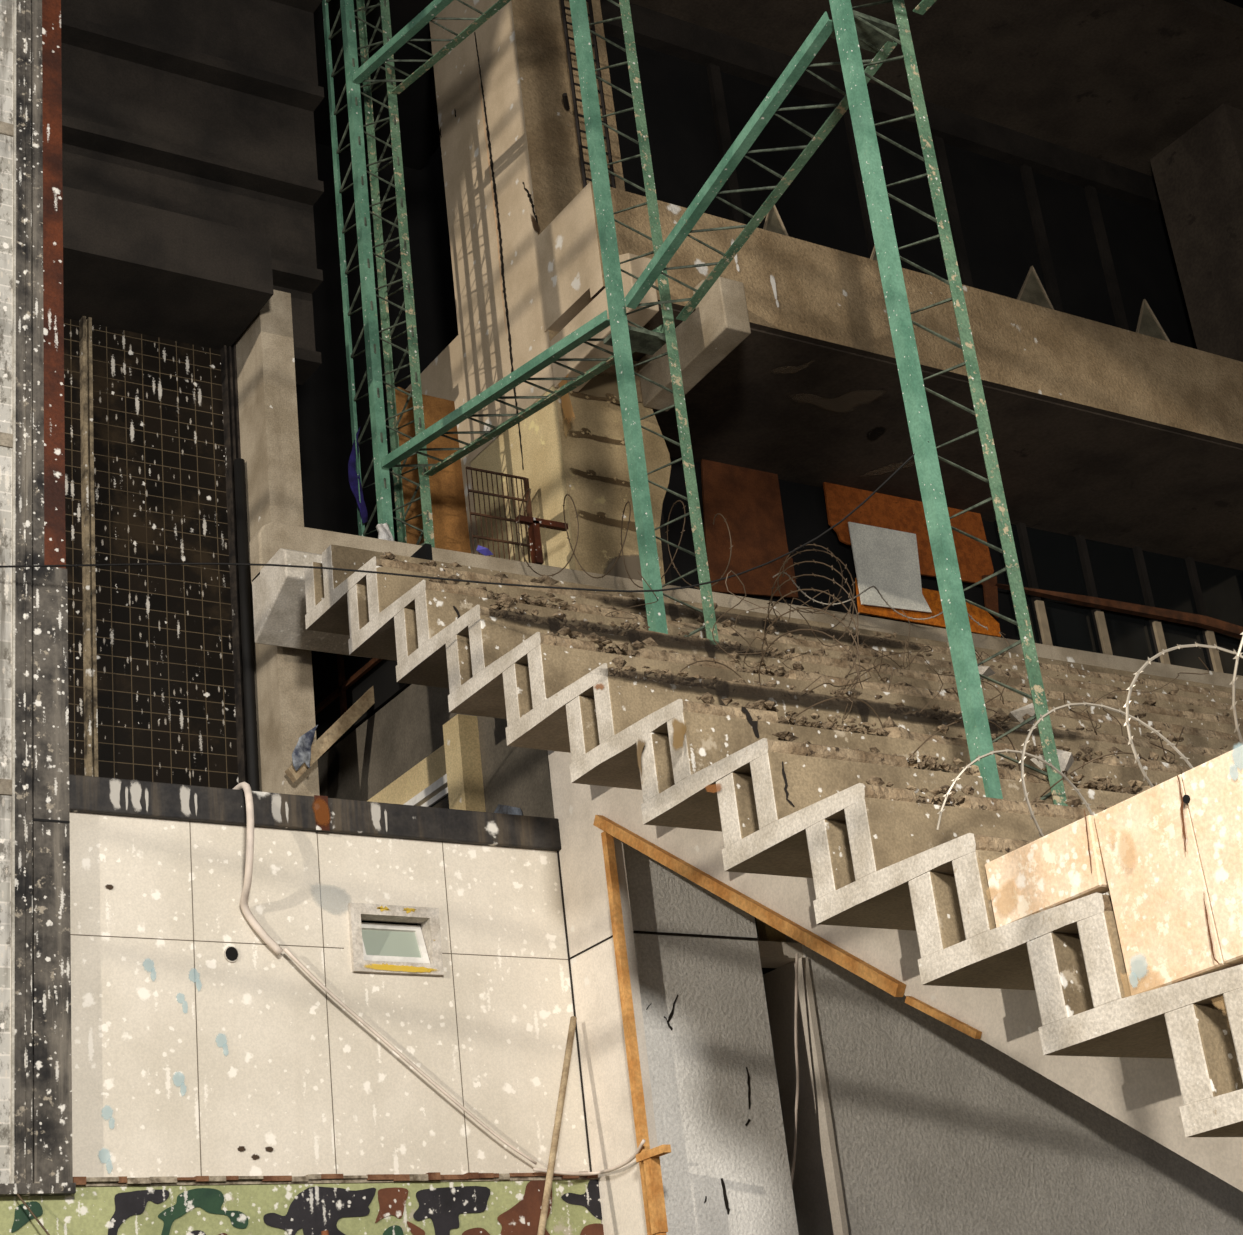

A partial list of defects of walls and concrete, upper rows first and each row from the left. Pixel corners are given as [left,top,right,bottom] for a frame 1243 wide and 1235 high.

crack [1177,775,1186,852]
crack [1204,898,1219,964]
crack [646,995,678,1030]
crack [744,1067,752,1127]